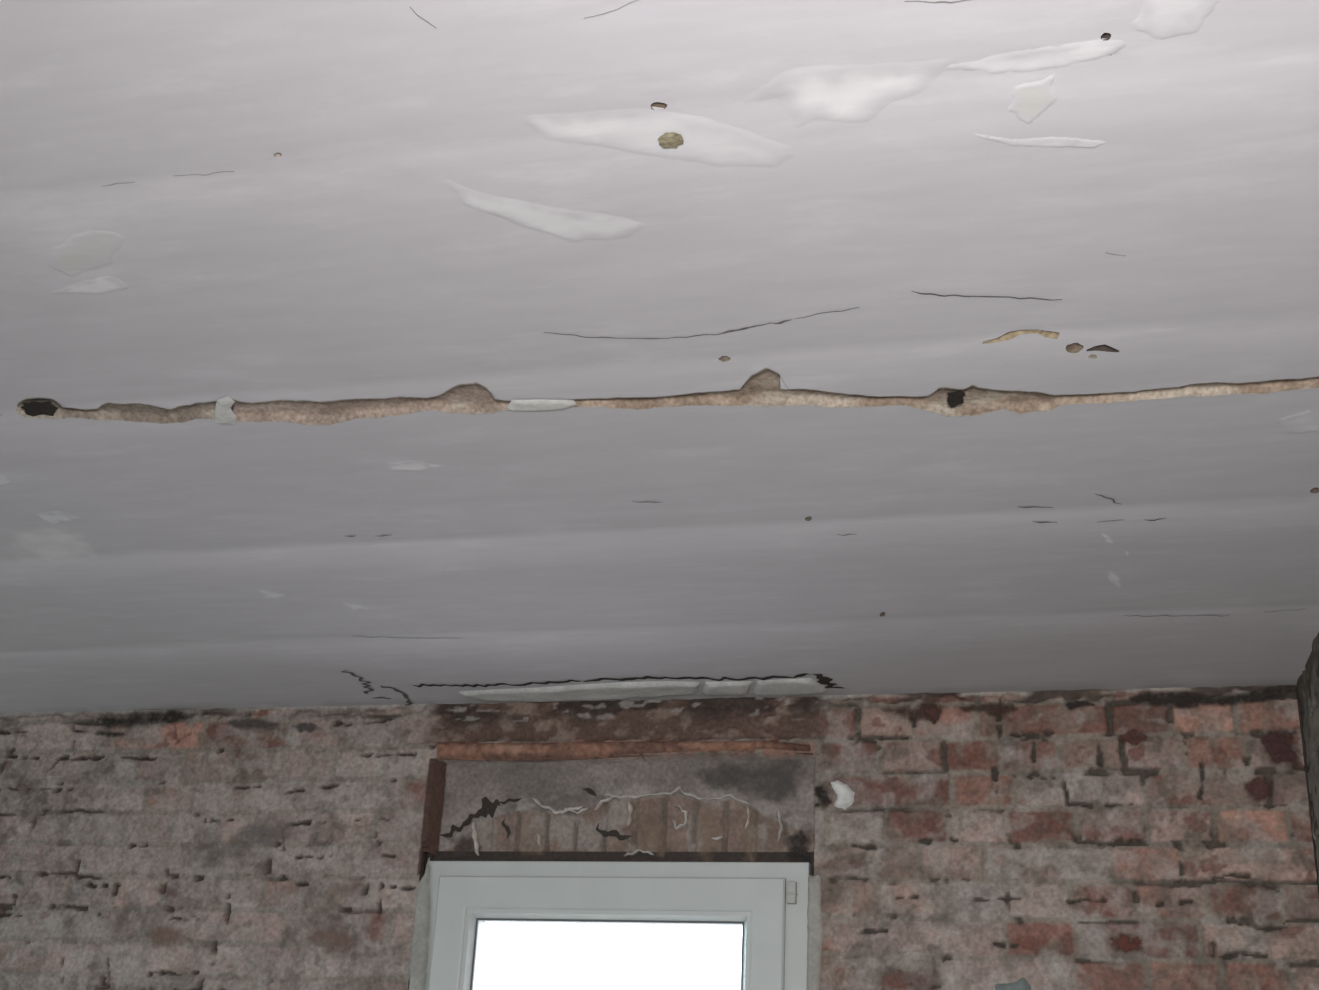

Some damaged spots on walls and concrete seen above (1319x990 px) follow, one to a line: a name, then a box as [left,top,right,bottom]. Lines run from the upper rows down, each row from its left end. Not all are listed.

crack [904,0,967,8]
crack [544,307,860,339]
flaking render [532,786,750,831]